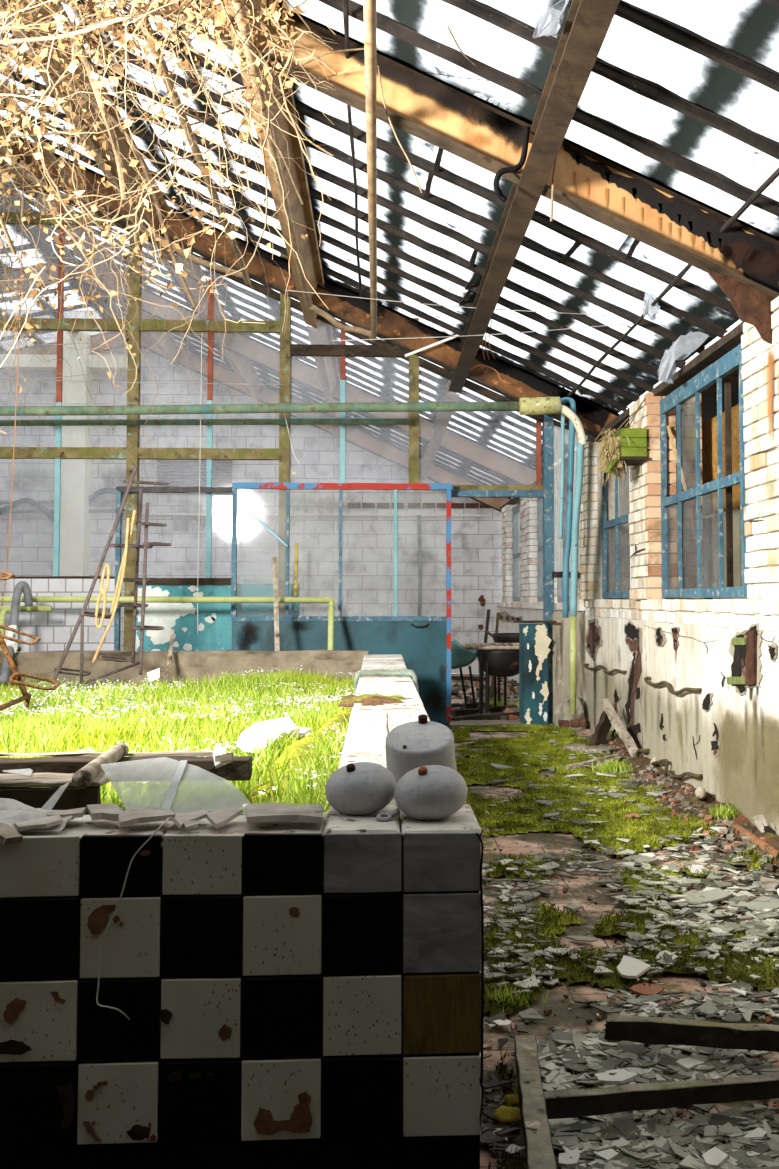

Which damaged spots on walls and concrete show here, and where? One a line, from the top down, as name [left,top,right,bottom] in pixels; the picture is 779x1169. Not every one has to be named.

peeling [135,585,217,651]
peeling [499,611,551,724]
flaking render [585,618,603,661]
flaking render [612,621,679,748]
flaking render [728,623,778,696]